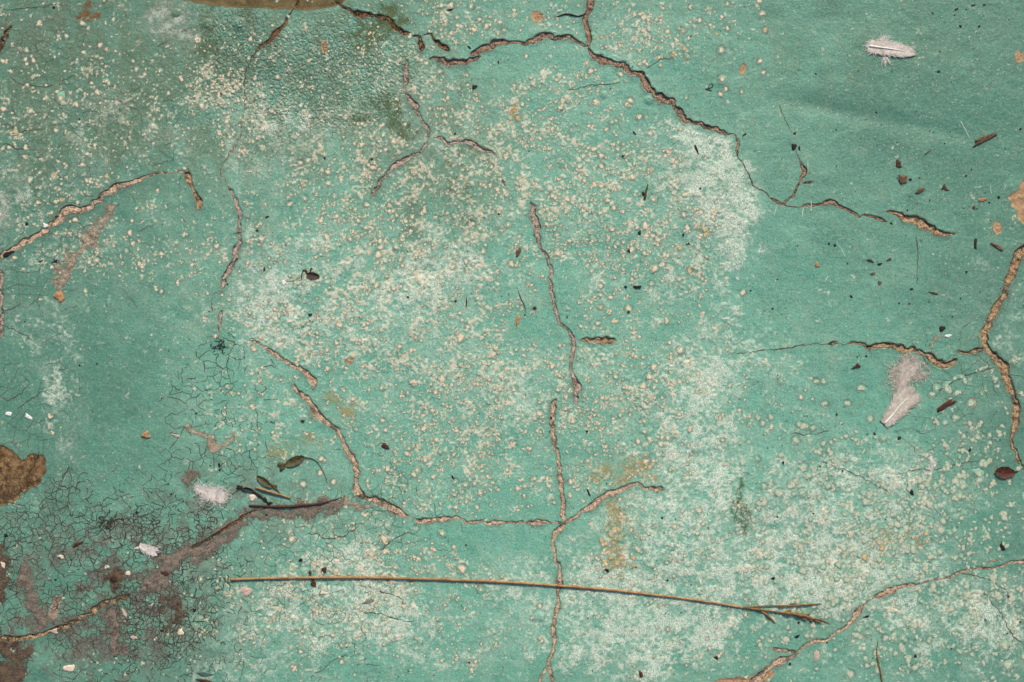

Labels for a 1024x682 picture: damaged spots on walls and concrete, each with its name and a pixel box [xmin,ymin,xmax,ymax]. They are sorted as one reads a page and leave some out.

spalling [186,0,345,11]
crack [333,0,888,222]
crack [886,210,957,281]
spalling [1007,179,1024,224]
crack [0,0,665,682]
crack [734,245,1024,492]
spalling [0,445,47,506]
crack [749,559,1024,682]